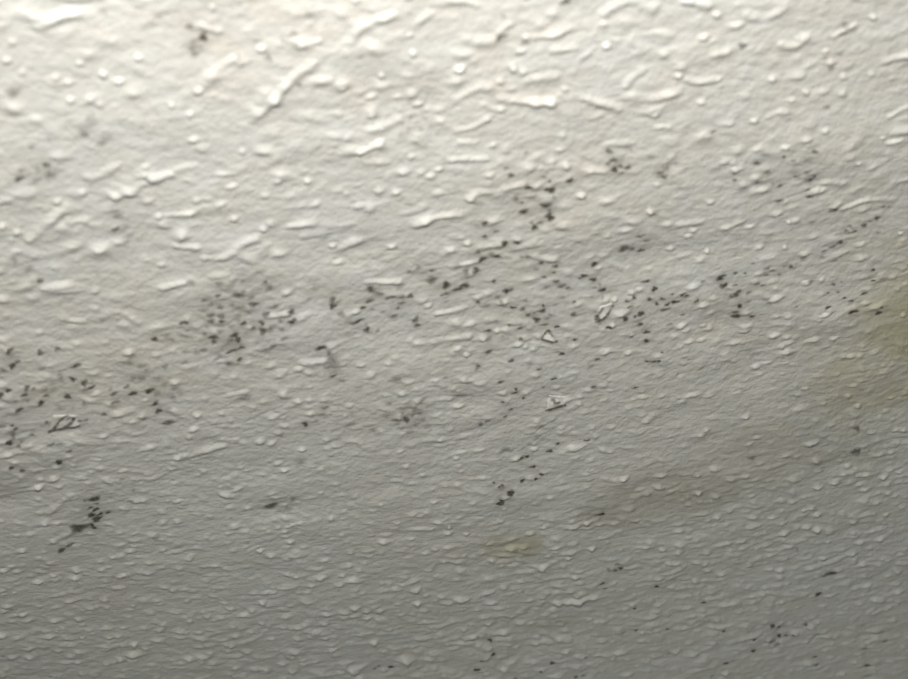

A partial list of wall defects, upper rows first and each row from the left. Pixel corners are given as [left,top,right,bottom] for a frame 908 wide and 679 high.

leakage [642,280,699,311]
leakage [717,272,754,318]
leakage [71,496,110,532]